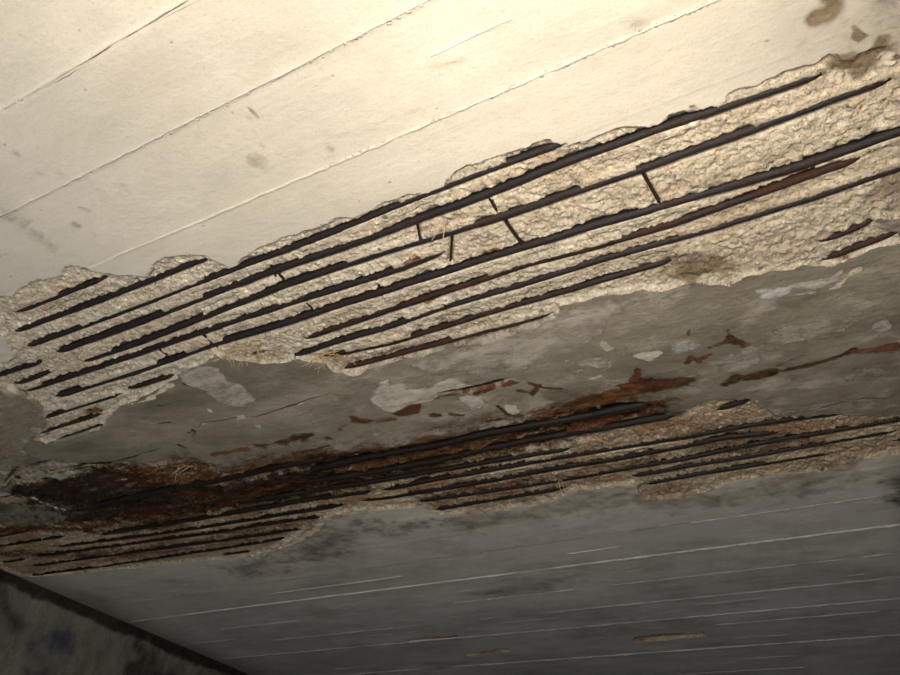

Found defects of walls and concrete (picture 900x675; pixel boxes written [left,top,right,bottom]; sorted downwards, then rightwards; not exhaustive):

damp [806,0,842,25]
spalling [0,26,900,444]
corrosion [684,330,749,364]
corrosion [720,342,900,387]
corrosion [0,368,695,535]
spalling [0,398,900,577]